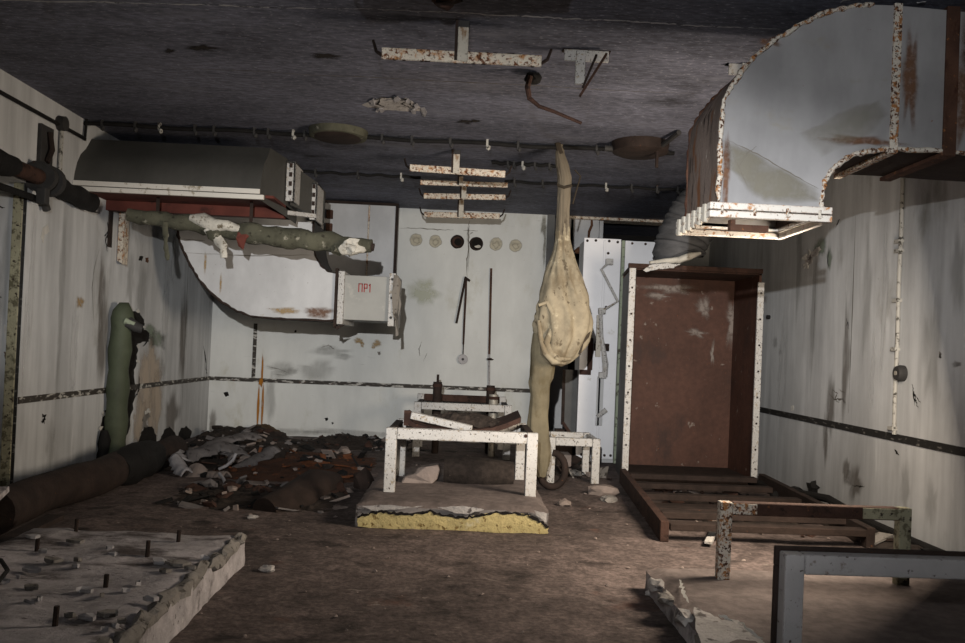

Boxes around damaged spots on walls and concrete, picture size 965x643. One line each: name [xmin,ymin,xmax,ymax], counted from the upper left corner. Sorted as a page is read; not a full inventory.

corrosion [309,308,331,317]